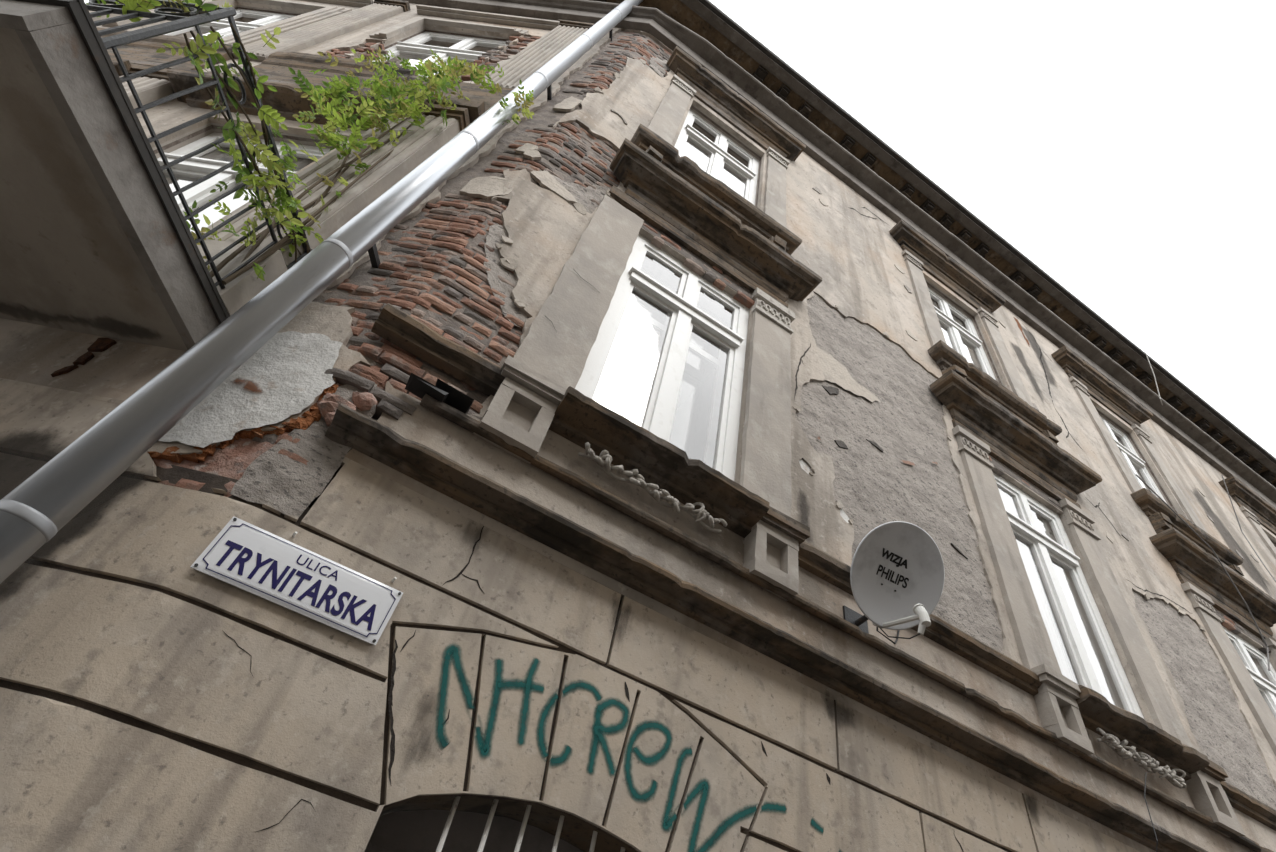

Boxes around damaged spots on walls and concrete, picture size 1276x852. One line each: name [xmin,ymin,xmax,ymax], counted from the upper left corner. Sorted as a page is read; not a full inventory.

spalling [148,31,671,517]
crack [443,526,485,594]
spalling [792,293,1003,653]
spalling [1132,590,1276,810]